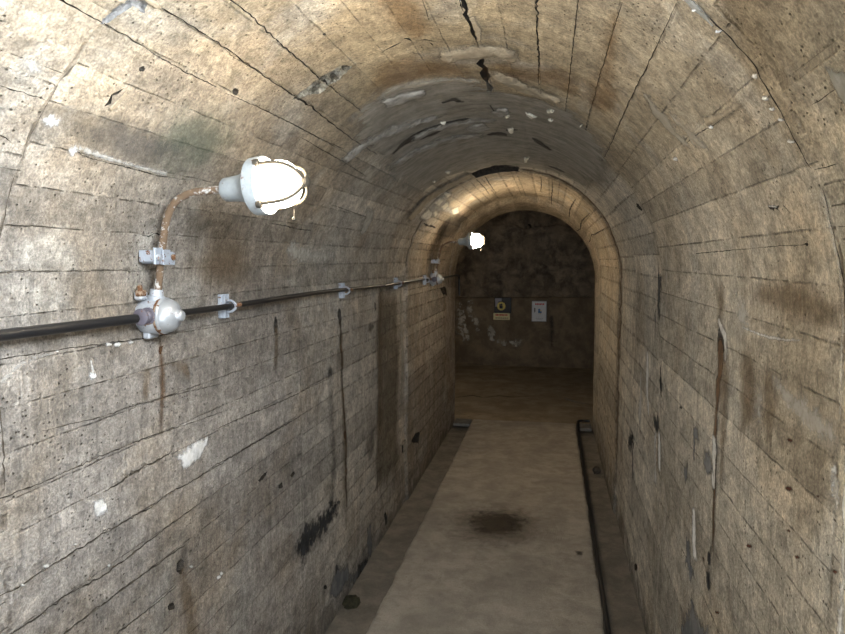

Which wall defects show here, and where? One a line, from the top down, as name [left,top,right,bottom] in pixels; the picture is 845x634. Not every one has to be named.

crack [459,0,499,93]
corrosion [712,339,724,545]
damp [470,511,526,534]